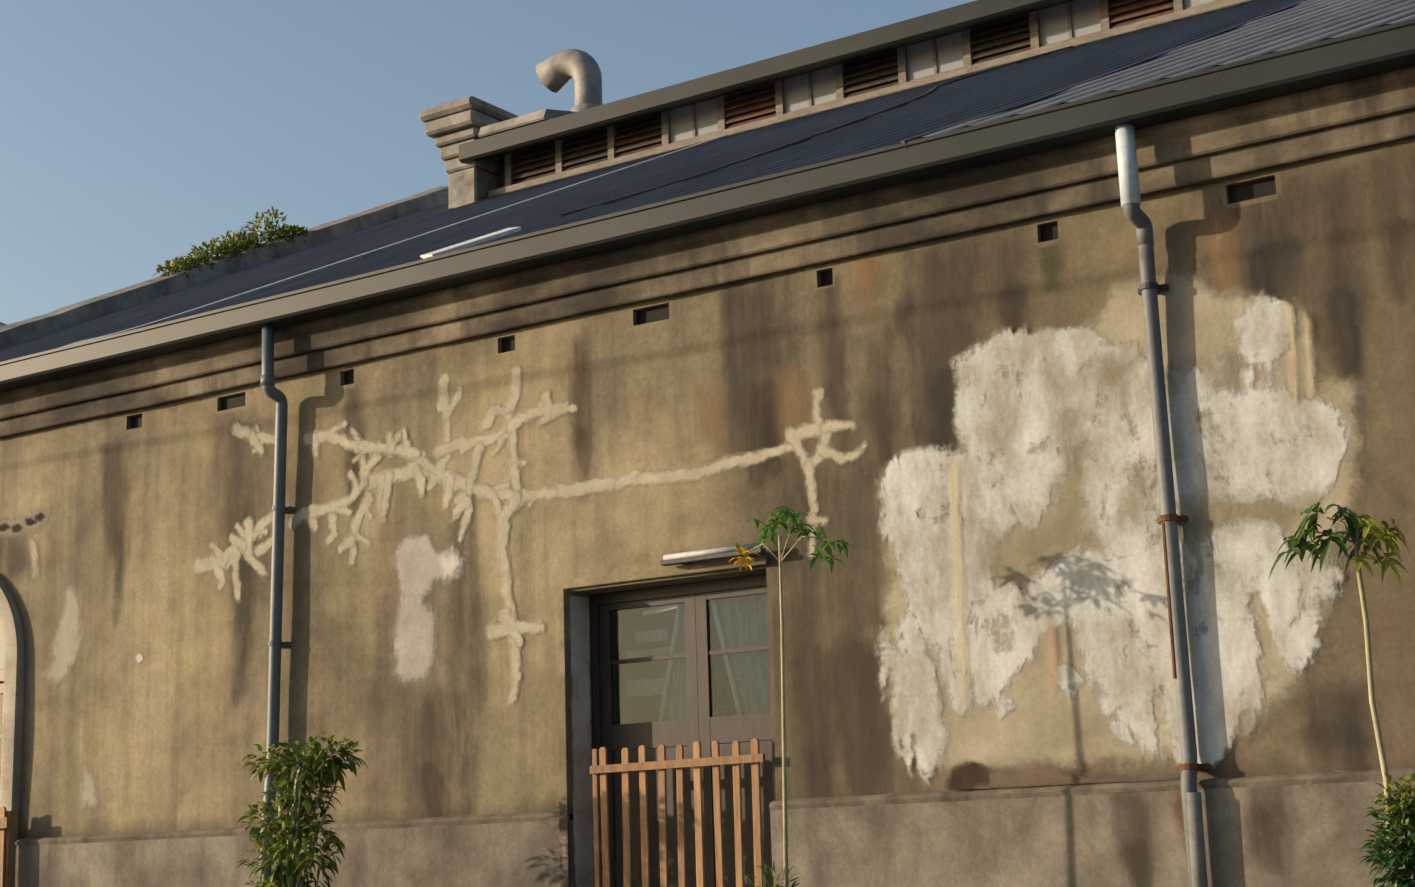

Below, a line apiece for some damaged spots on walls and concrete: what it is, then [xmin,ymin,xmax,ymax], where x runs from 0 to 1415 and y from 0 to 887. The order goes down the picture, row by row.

flaking render [440,550,460,579]
crack [193,367,867,705]
flaking render [879,270,1362,790]